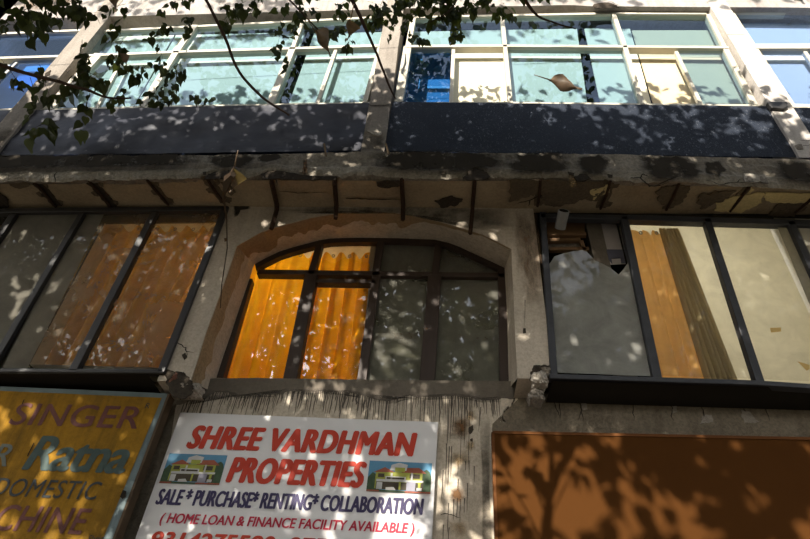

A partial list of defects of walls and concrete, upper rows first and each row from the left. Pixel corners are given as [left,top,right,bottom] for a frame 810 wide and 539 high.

spalling [201,170,236,203]
spalling [261,170,337,181]
peeling [434,196,463,208]
peeling [508,174,620,210]
peeling [655,183,690,211]
peeling [696,173,810,217]
peeling [164,212,509,400]
spalling [526,364,551,408]
rust [454,420,467,434]
water stain [180,390,519,539]
rust [452,488,463,501]